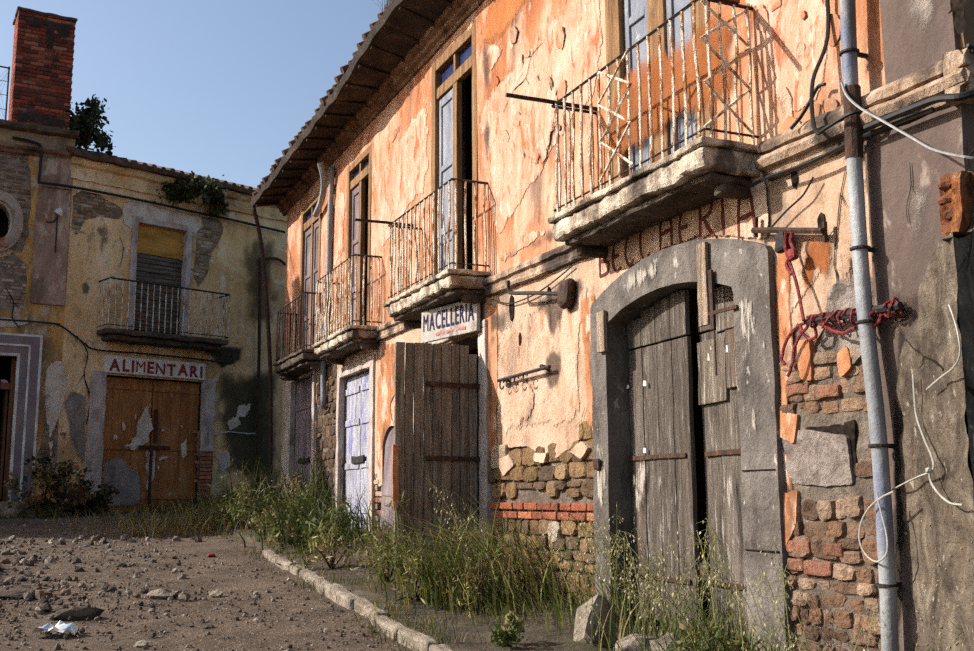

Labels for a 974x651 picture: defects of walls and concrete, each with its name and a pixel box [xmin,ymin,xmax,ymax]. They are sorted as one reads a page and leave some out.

crack [948,0,967,35]
peeling [479,0,602,233]
spalling [0,152,31,327]
spalling [69,191,223,287]
peeling [501,229,545,262]
peeling [789,212,831,313]
peeling [36,361,67,475]
peeling [227,404,250,430]
spalling [487,286,606,605]
spalling [778,268,881,651]